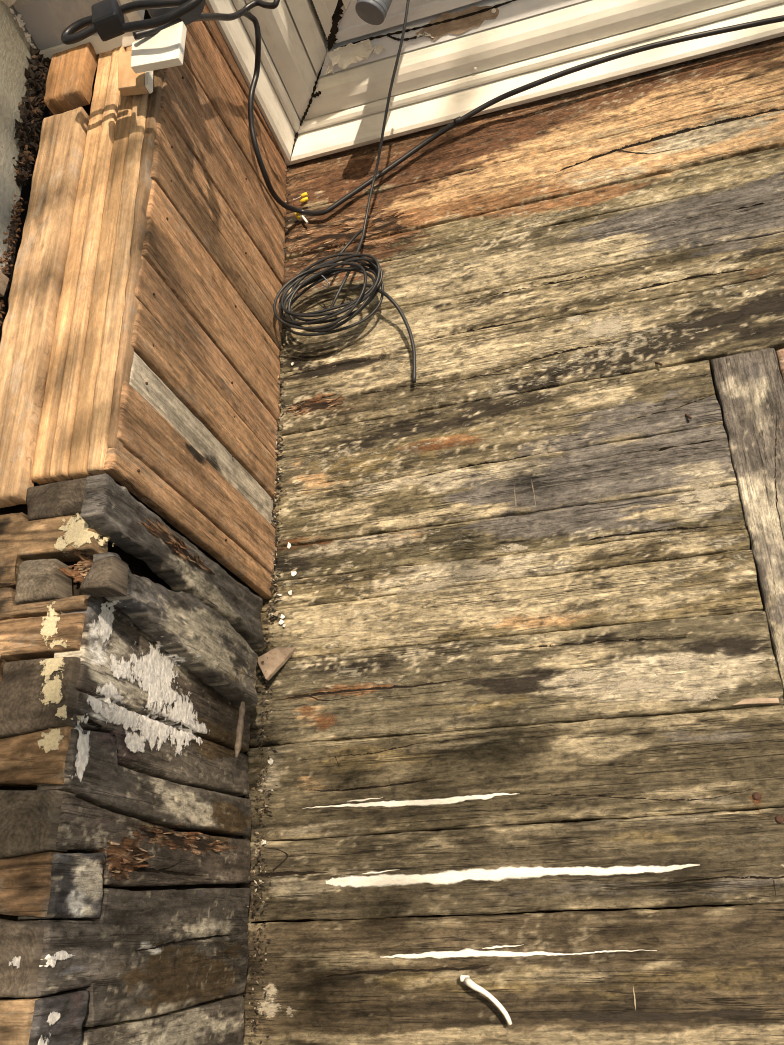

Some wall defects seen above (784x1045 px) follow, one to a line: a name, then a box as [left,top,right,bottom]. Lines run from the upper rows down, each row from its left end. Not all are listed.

peeling [415,5,499,41]
peeling [325,39,386,75]
crack [547,109,784,176]
peeling [54,513,114,557]
peeling [37,600,210,781]